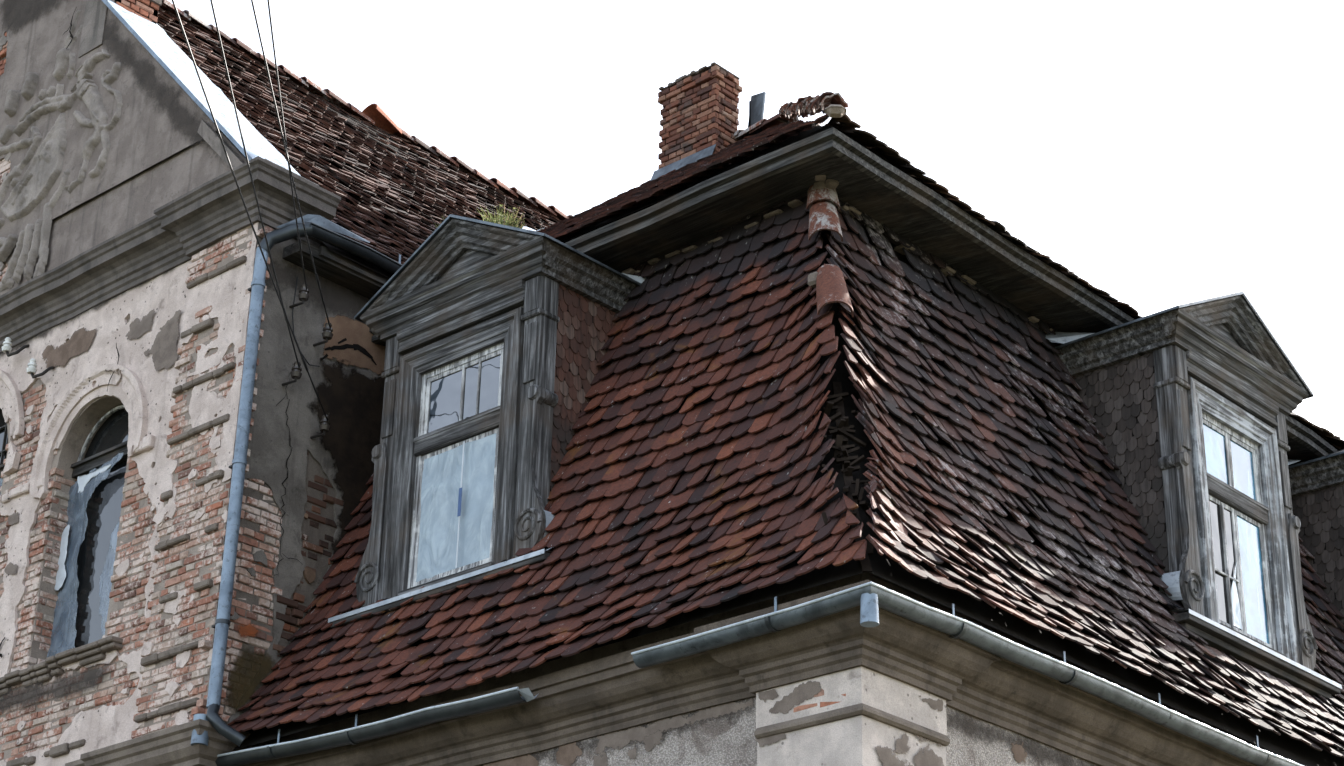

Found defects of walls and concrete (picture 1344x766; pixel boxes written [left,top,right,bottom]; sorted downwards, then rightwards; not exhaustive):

spalling [0,32,8,76]
spalling [0,152,12,188]
damp [309,360,385,559]
spalling [0,225,344,762]
peeling [919,696,943,711]
peeling [875,734,944,766]